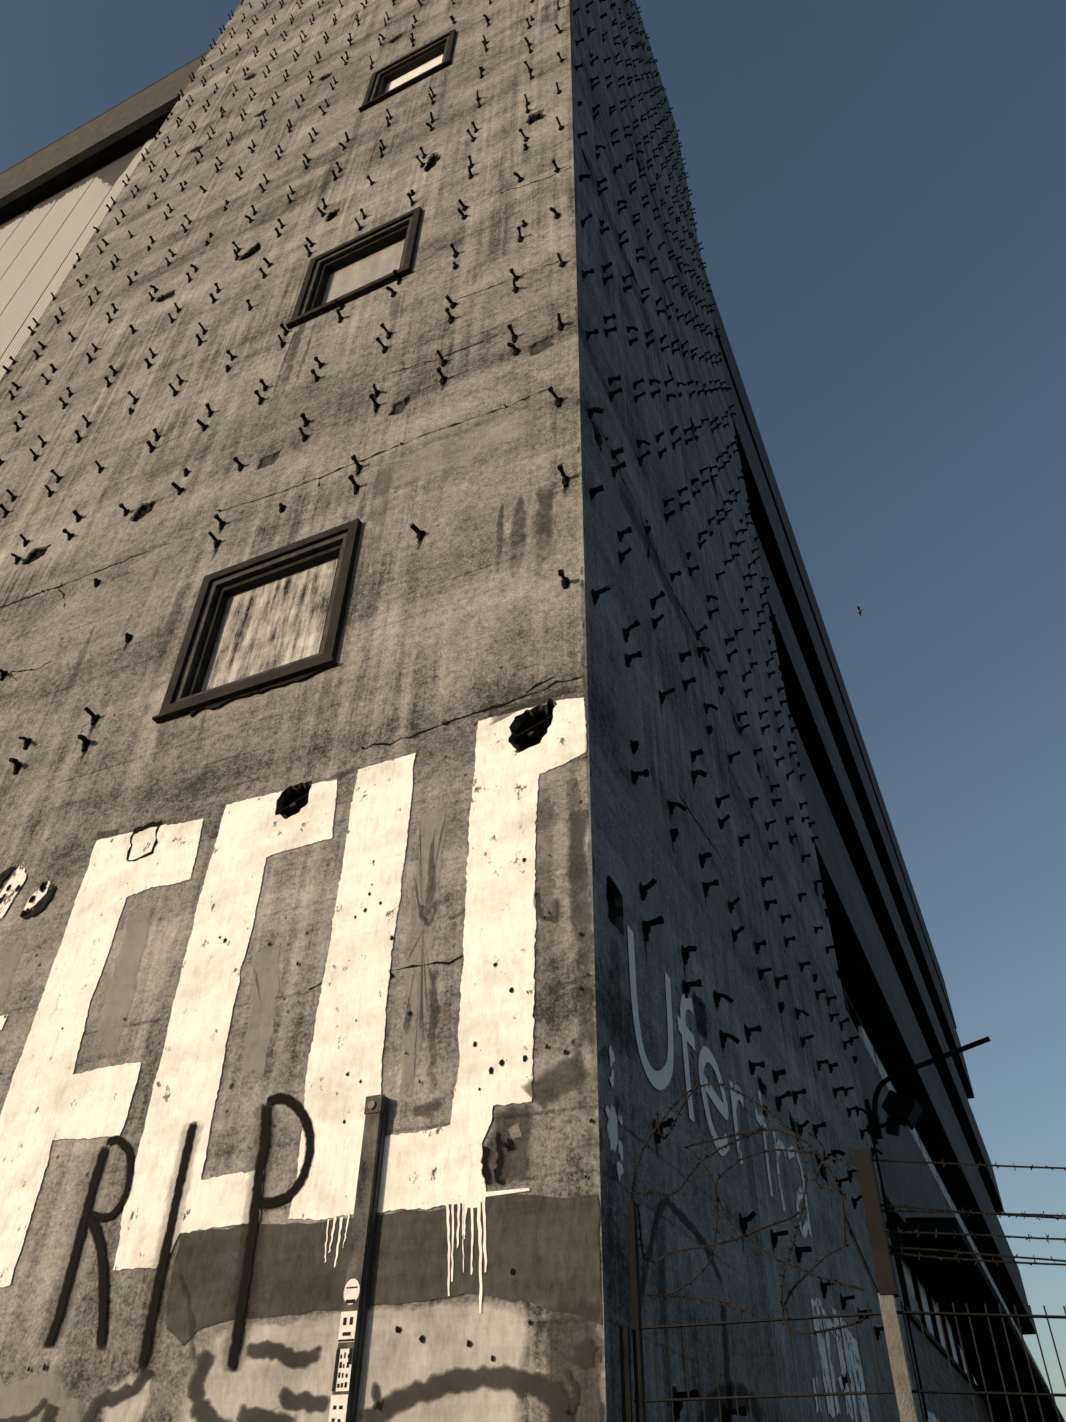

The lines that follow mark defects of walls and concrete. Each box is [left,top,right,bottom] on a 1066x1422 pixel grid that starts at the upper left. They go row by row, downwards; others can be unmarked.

leakage [497,490,553,562]
crack [217,385,777,830]
spalling [494,686,569,753]
spalling [276,768,351,819]
crack [389,955,462,979]